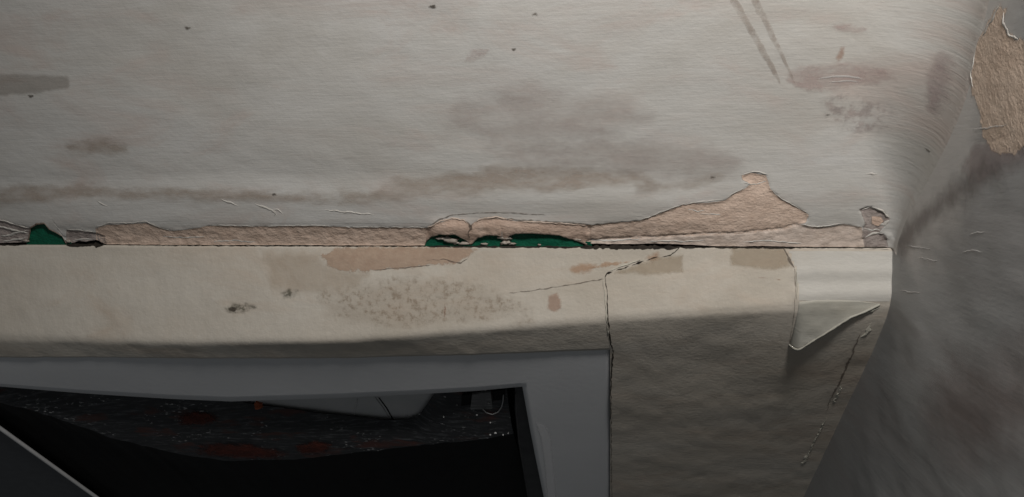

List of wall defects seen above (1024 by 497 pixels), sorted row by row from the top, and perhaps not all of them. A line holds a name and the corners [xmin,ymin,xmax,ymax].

spalling [970,5,1024,155]
spalling [0,220,30,245]
crack [67,241,103,249]
crack [131,241,260,249]
spalling [66,171,890,272]
crack [315,205,810,482]
crack [801,324,872,466]